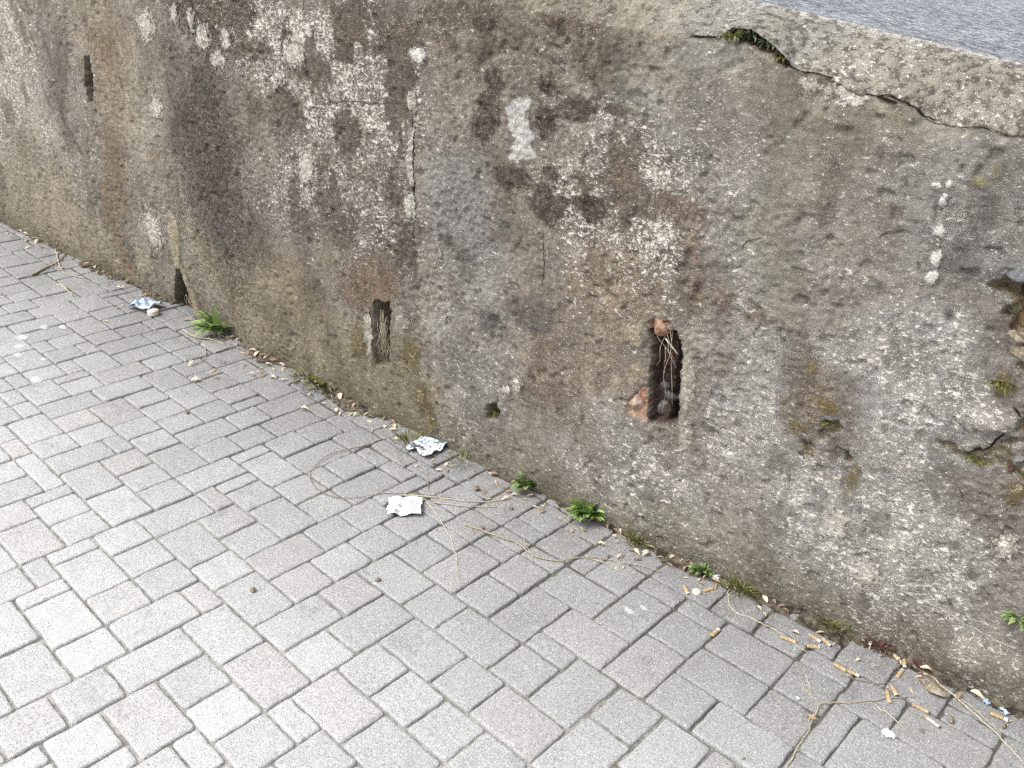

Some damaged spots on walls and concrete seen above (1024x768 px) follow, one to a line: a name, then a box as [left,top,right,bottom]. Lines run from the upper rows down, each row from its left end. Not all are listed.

efflorescence [136,7,157,43]
crack [790,67,832,79]
damp [148,0,308,285]
efflorescence [297,142,317,193]
crack [329,101,416,240]
damp [469,69,505,142]
damp [491,165,608,233]
damp [531,74,631,137]
crack [866,93,1024,137]
peeling [624,316,671,347]
spalling [624,361,648,423]
crack [965,407,1023,453]